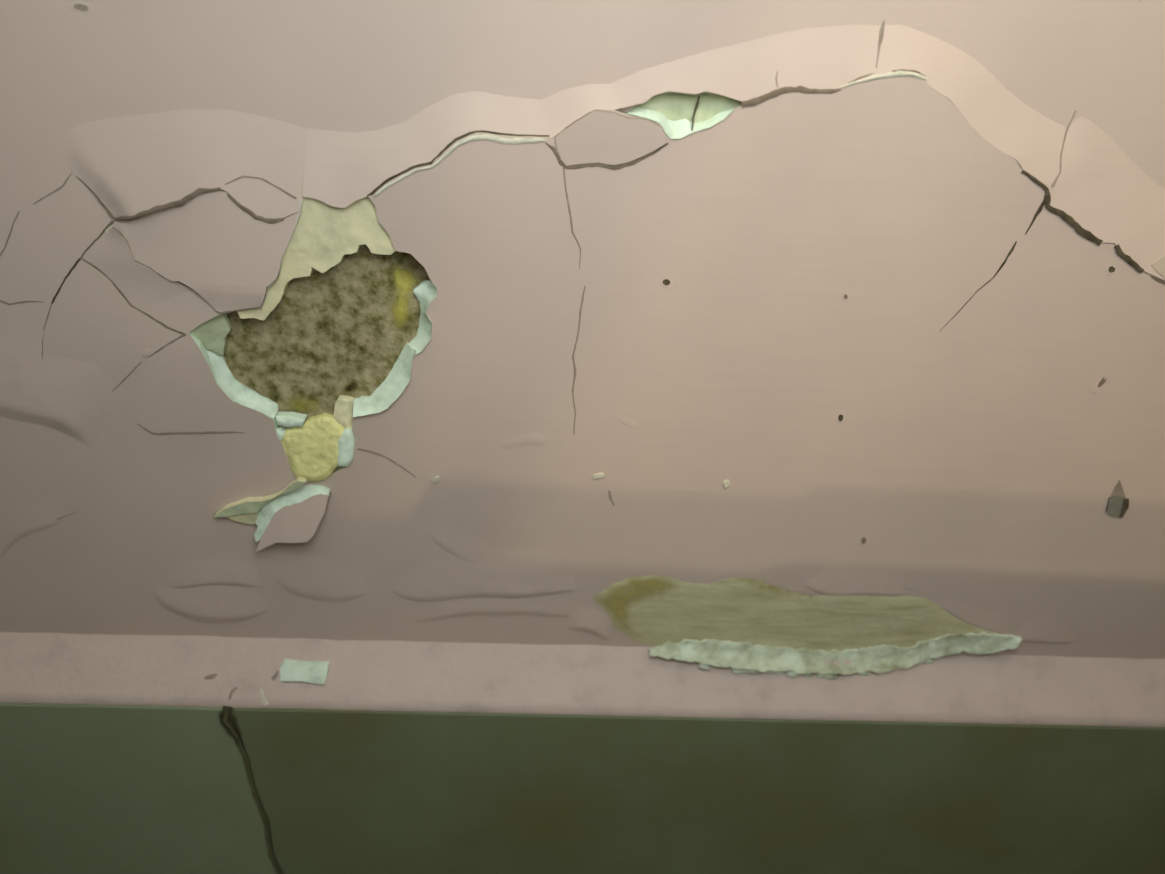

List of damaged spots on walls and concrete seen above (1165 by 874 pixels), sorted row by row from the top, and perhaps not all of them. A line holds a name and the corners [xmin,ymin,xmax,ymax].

peeling [555,91,741,166]
crack [741,20,927,107]
crack [0,173,297,393]
crack [367,130,668,434]
crack [939,110,1165,332]
spalling [191,196,437,552]
crack [357,448,416,477]
flaking render [593,575,1022,680]
crack [220,705,282,874]